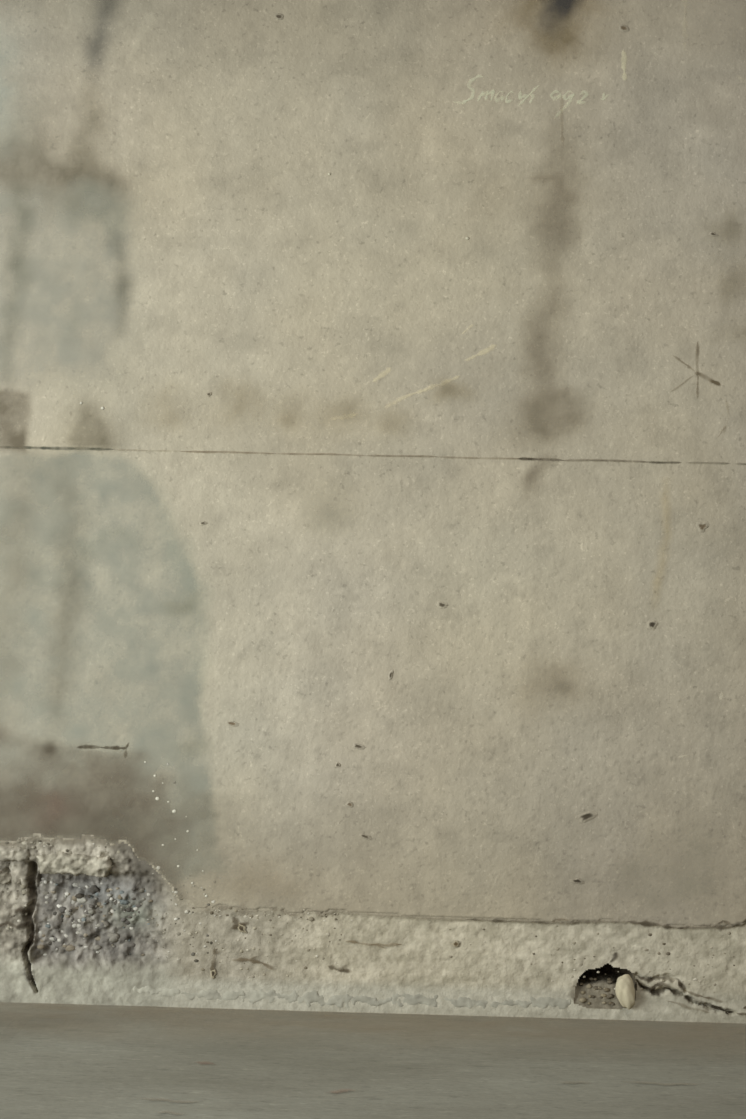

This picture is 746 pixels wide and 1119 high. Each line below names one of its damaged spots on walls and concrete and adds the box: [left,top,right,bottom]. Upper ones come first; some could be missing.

leakage [0,393,24,449]
leakage [0,415,216,887]
crack [0,881,36,983]
spalling [0,833,746,1024]
crack [637,976,746,1015]